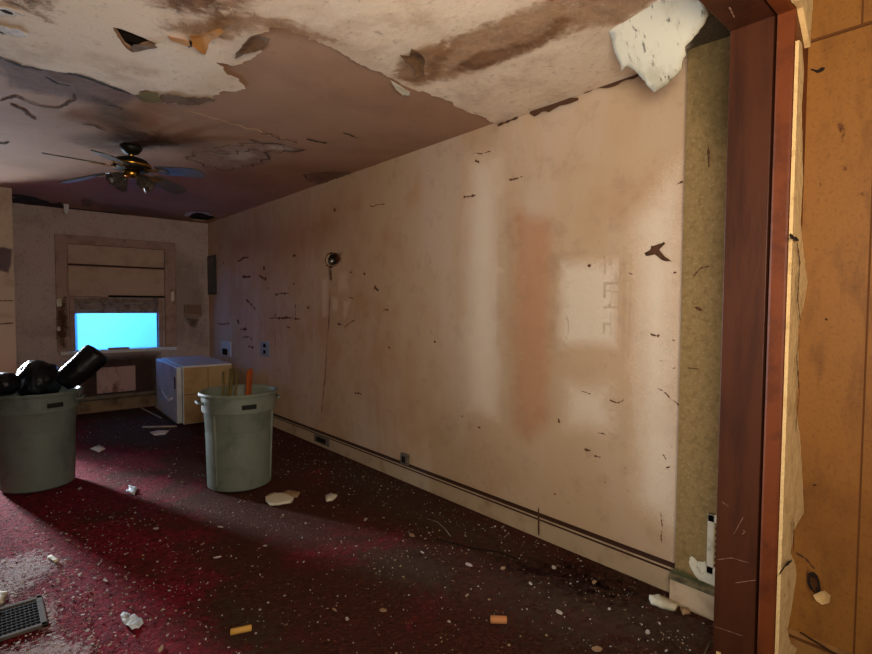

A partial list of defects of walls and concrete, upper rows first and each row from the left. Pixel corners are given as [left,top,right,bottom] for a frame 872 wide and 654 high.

damp [137,0,347,45]
flaking render [0,0,657,126]
damp [389,0,654,86]
flaking render [685,9,728,58]